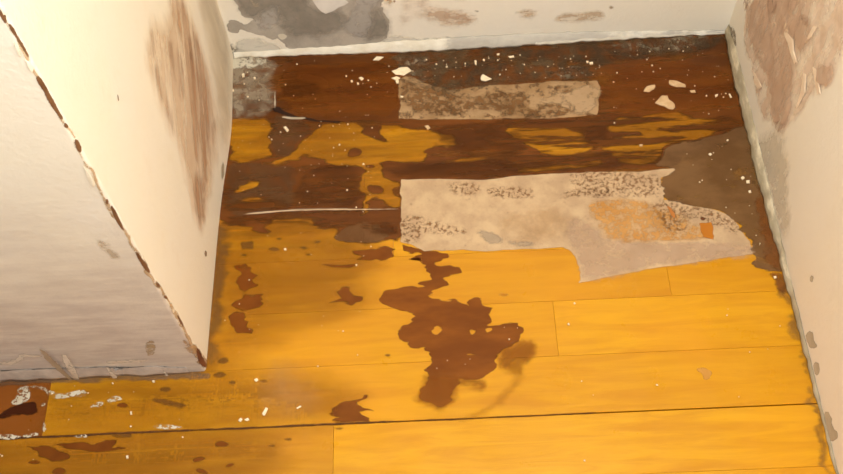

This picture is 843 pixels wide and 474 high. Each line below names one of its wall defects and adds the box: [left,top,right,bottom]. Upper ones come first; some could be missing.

leakage [190,51,209,213]
peeling [392,67,601,130]
leakage [219,0,843,408]
peeling [400,168,753,283]
spalling [184,341,207,367]